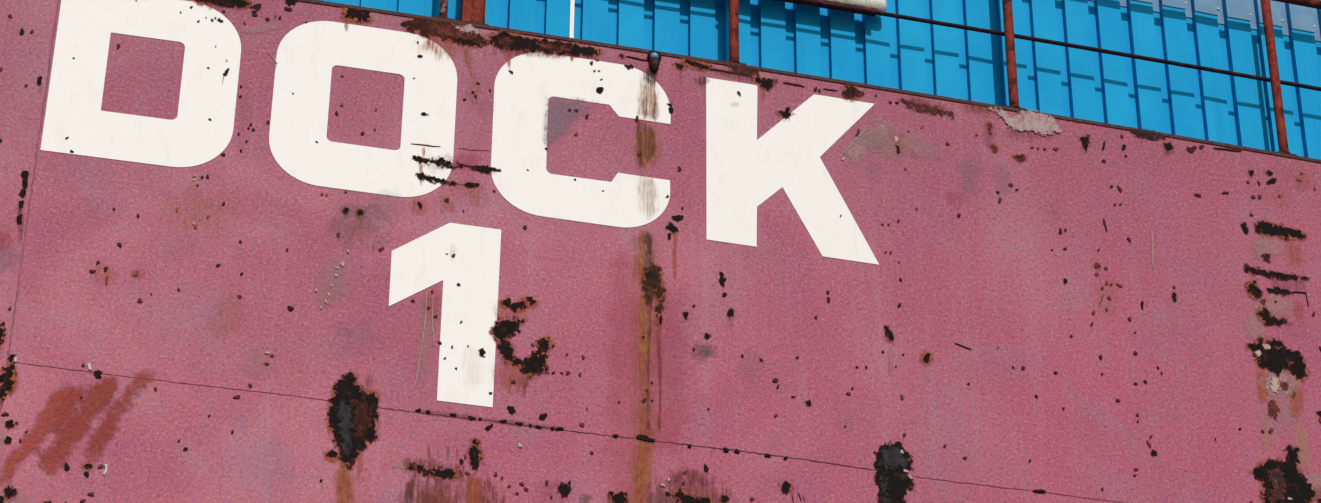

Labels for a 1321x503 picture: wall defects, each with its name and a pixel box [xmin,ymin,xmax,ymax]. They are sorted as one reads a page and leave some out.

corrosion [341,4,378,29]
corrosion [619,53,659,166]
peeling [975,106,1127,163]
spalling [1164,141,1242,154]
corrosion [633,234,729,503]